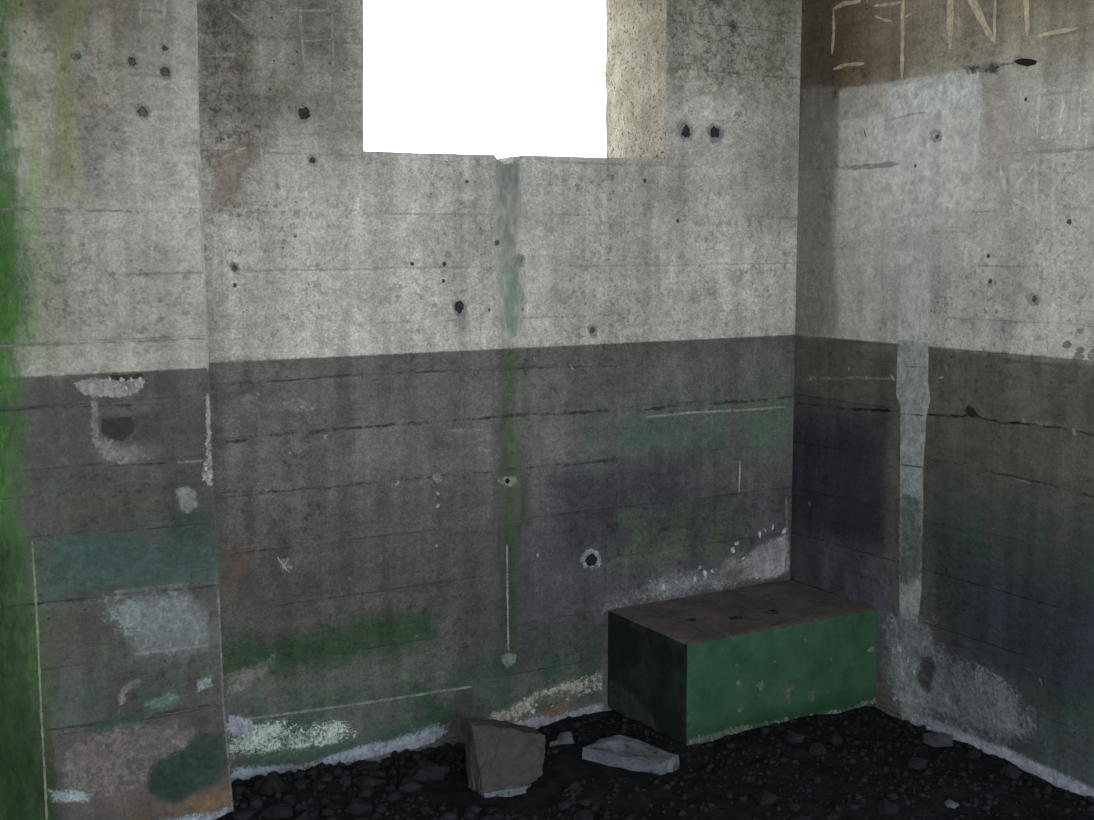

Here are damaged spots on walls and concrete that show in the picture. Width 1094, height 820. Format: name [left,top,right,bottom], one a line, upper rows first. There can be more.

leakage [501,162,517,193]
leakage [504,269,520,331]
peeling [73,373,145,398]
crack [226,409,607,444]
crack [639,396,891,418]
crack [927,406,1094,436]
crack [994,472,1094,497]
leakage [32,542,48,818]
leakage [226,713,454,784]